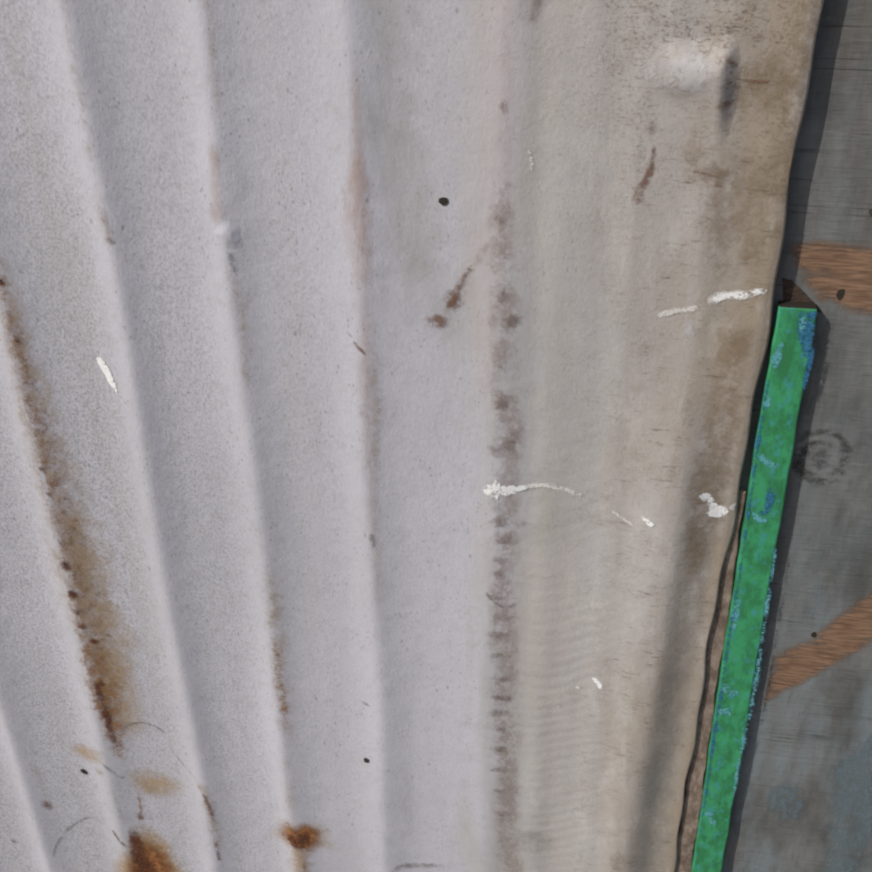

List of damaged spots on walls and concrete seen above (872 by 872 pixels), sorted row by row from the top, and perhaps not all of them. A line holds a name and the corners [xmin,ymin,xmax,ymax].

corrosion [640,149,654,187]
corrosion [433,268,470,327]
corrosion [57,497,127,756]
corrosion [113,831,179,872]
corrosion [283,826,317,869]